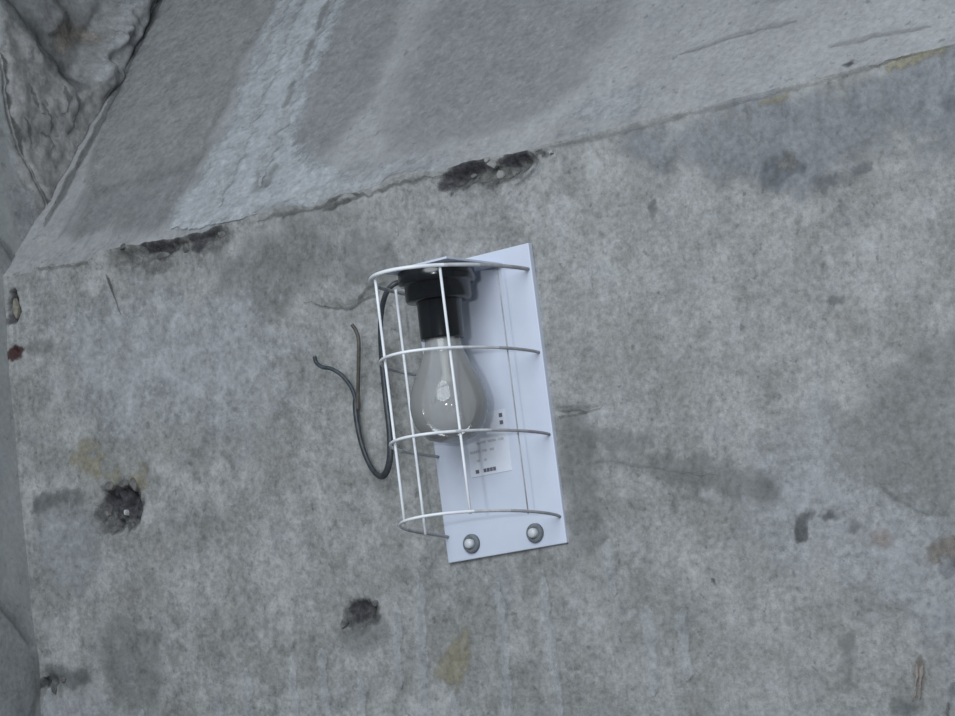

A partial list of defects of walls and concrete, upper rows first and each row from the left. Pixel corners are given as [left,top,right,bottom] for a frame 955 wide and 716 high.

crack [0,0,161,225]
spalling [439,149,554,196]
crack [258,176,436,222]
spalling [111,225,229,274]
corrosion [7,345,24,361]
spalling [95,477,145,535]
spalling [340,600,381,635]